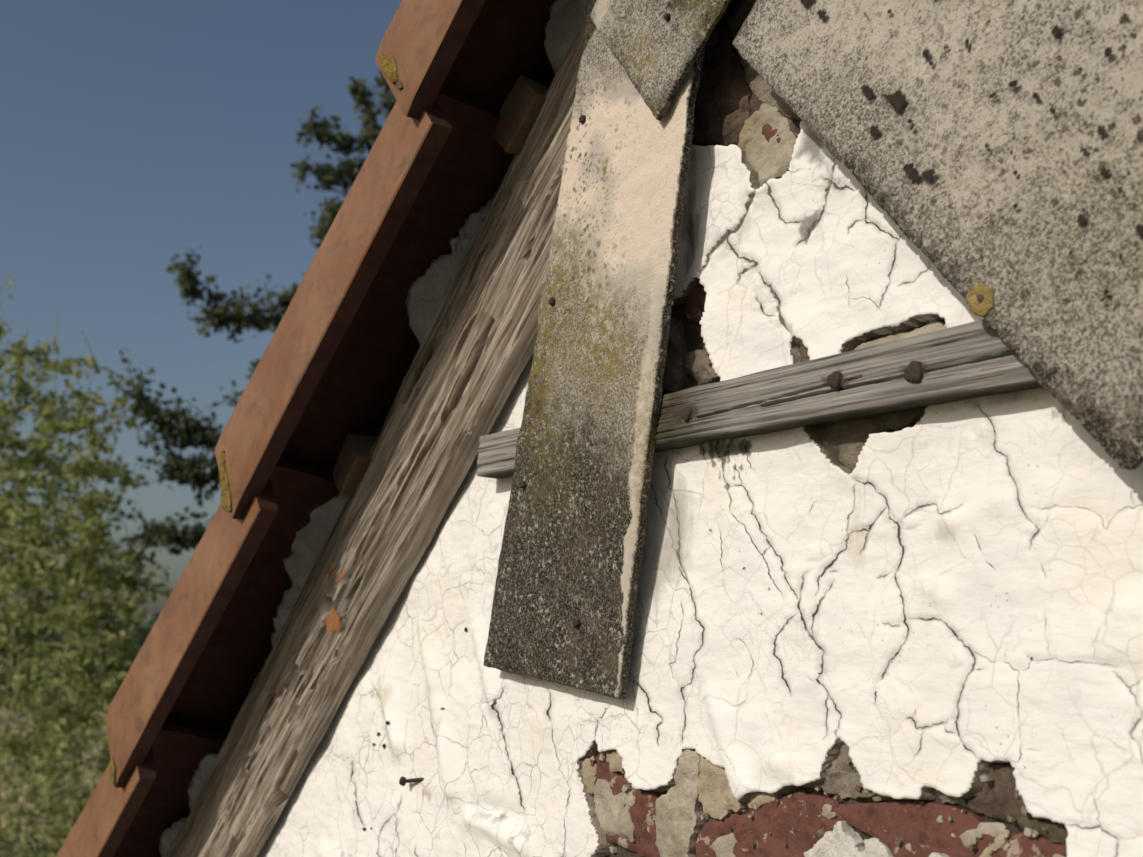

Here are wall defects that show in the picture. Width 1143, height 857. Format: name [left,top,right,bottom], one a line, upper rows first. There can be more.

flaking render [692,0,801,187]
crack [700,163,929,331]
flaking render [798,344,810,363]
flaking render [854,320,946,350]
flaking render [818,407,927,470]
crack [976,405,1142,577]
crack [628,457,705,743]
crack [718,452,1143,760]
crack [338,757,418,857]
crack [483,688,524,808]
flaking render [582,744,1068,857]
crack [1070,800,1137,857]